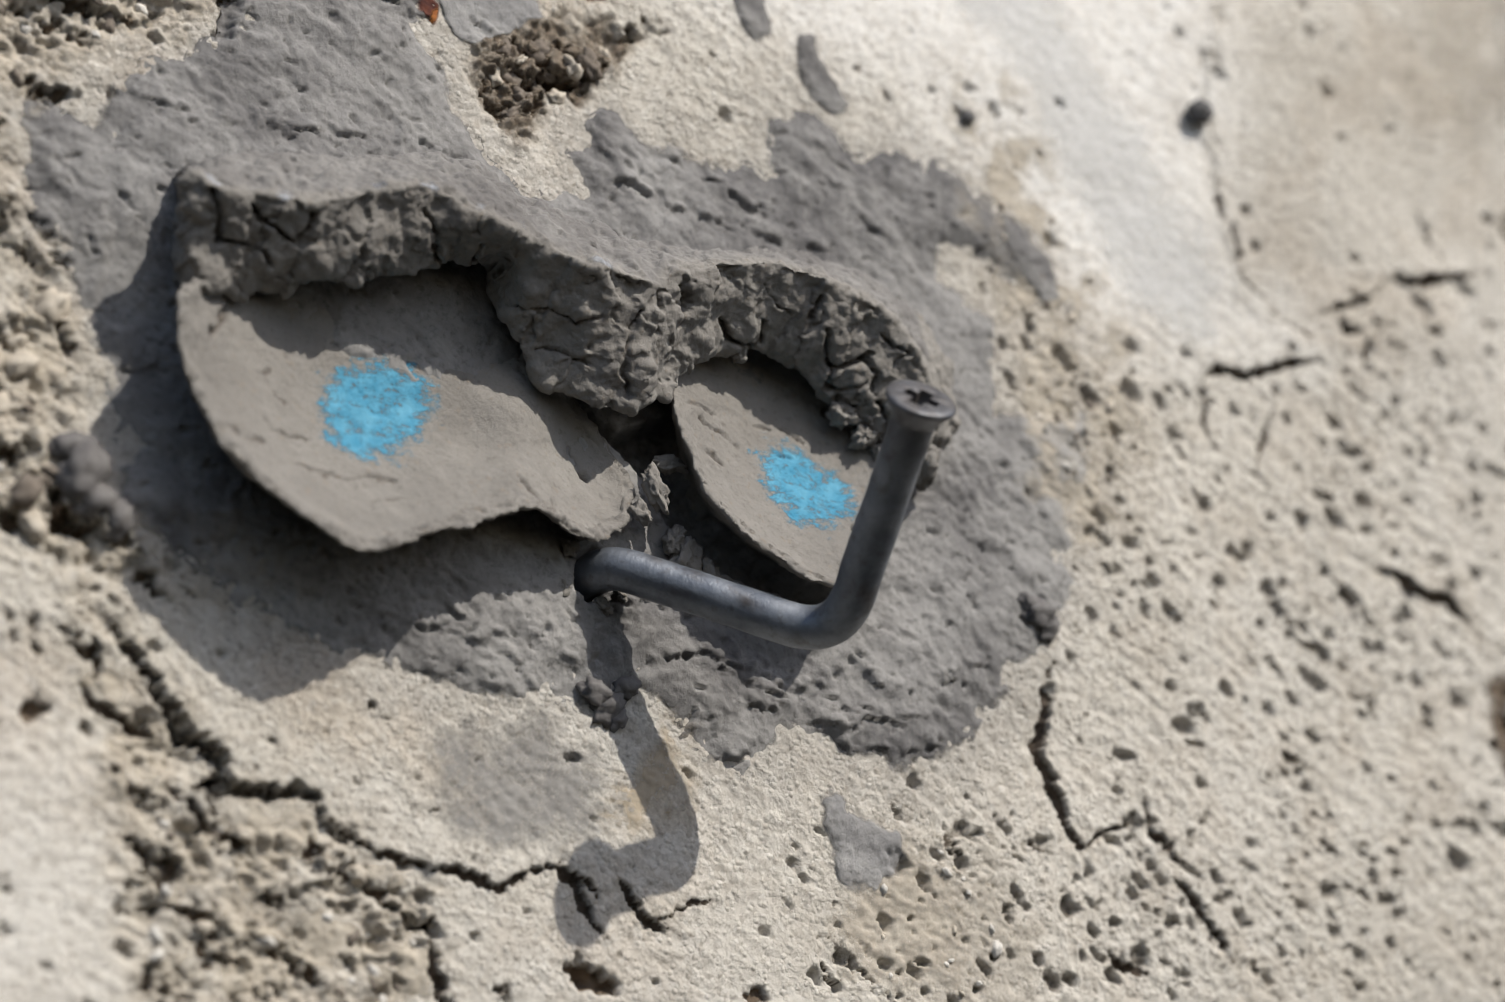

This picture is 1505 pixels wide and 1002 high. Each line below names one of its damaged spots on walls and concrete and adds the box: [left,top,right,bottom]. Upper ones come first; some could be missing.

flaking render [0,44,67,105]
flaking render [0,0,148,56]
flaking render [478,17,646,130]
flaking render [988,138,1055,243]
flaking render [0,253,75,417]
flaking render [1004,274,1145,542]
crack [1199,190,1471,462]
flaking render [0,430,164,598]
crack [82,625,711,934]
crack [1027,661,1234,965]
spalling [1281,751,1304,771]
spalling [491,984,509,997]